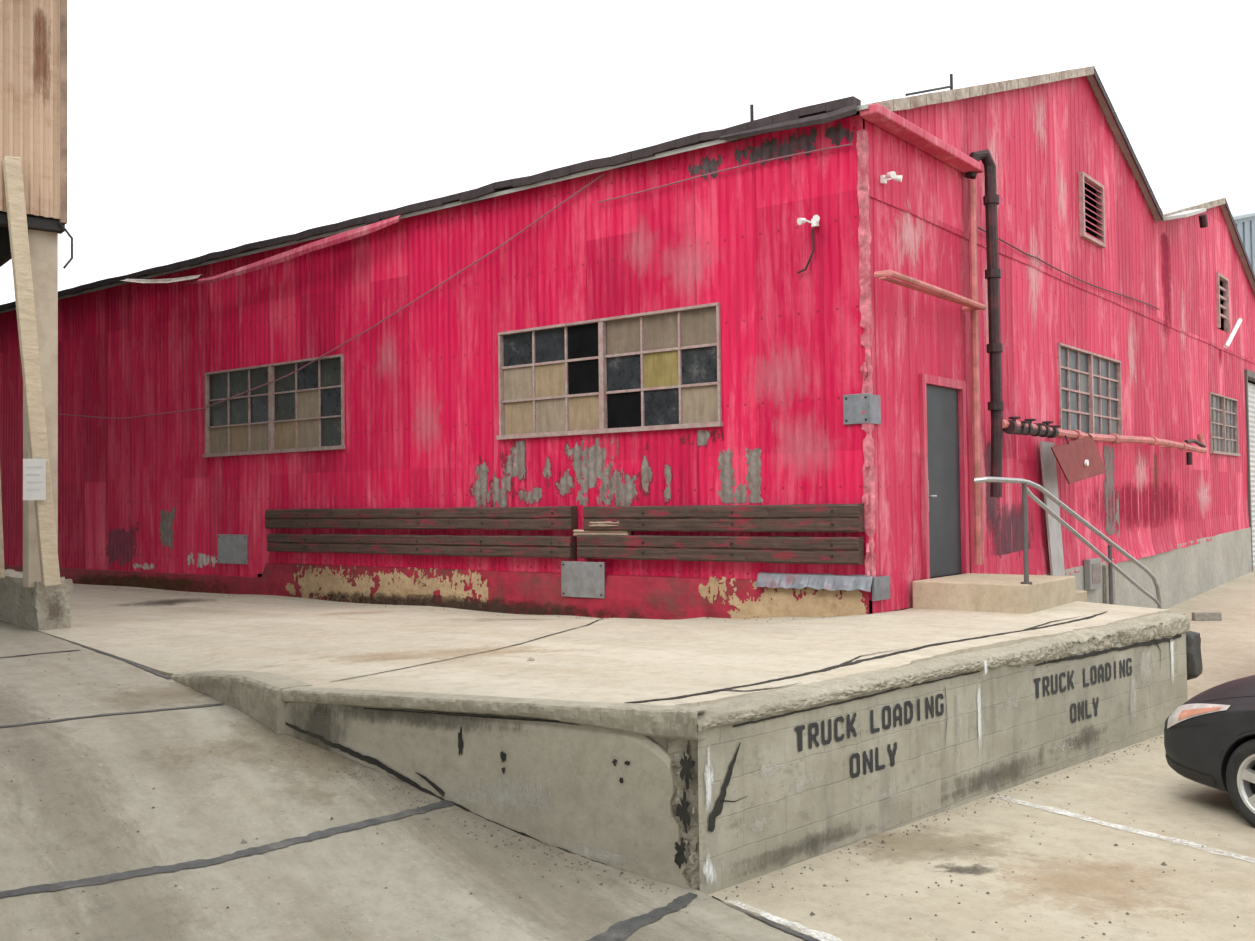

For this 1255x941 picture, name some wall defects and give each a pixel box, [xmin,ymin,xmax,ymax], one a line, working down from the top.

rust [36,15,47,79]
peeling [469,438,673,507]
peeling [679,429,764,503]
peeling [286,565,488,603]
peeling [699,576,867,619]
crack [1035,634,1182,666]
crack [625,611,1107,832]